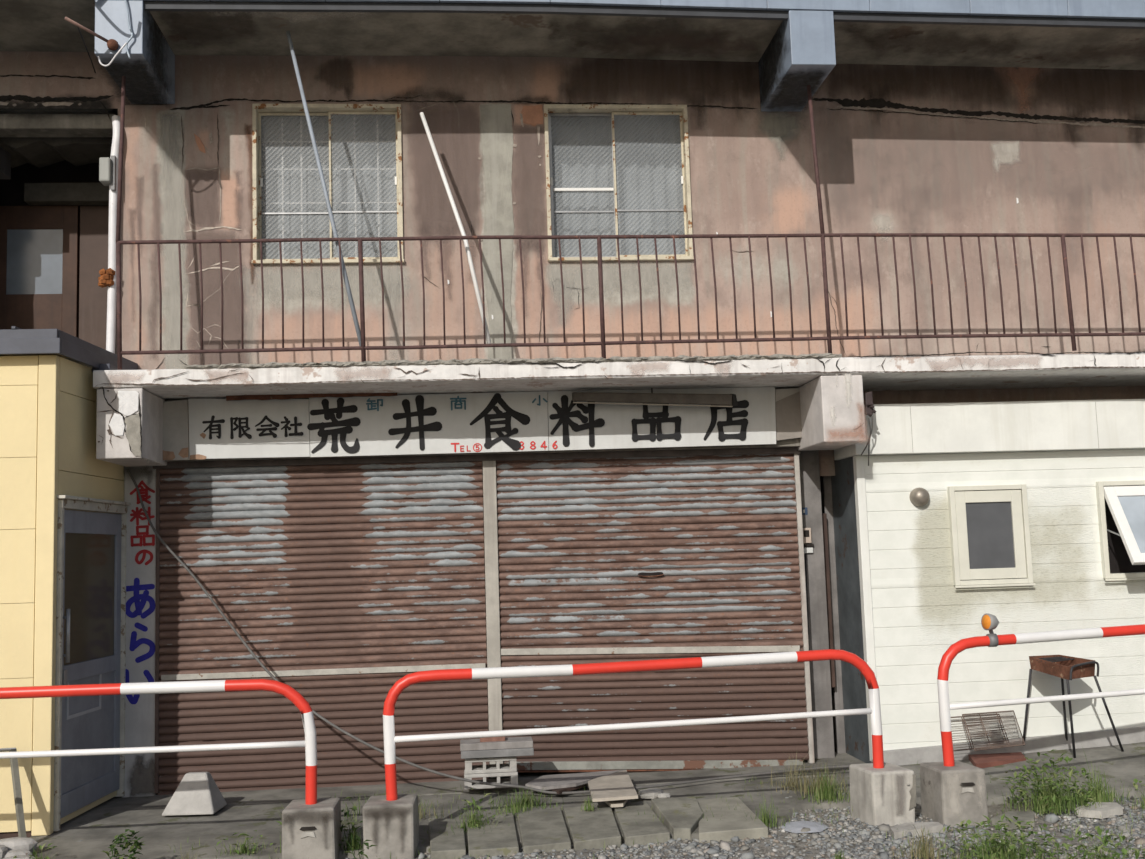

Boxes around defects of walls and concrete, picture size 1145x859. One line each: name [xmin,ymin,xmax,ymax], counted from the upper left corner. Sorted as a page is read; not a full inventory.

water stain [0,97,111,116]
crack [0,75,114,121]
water stain [392,92,477,244]
crack [94,95,1145,455]
spalling [98,375,141,456]